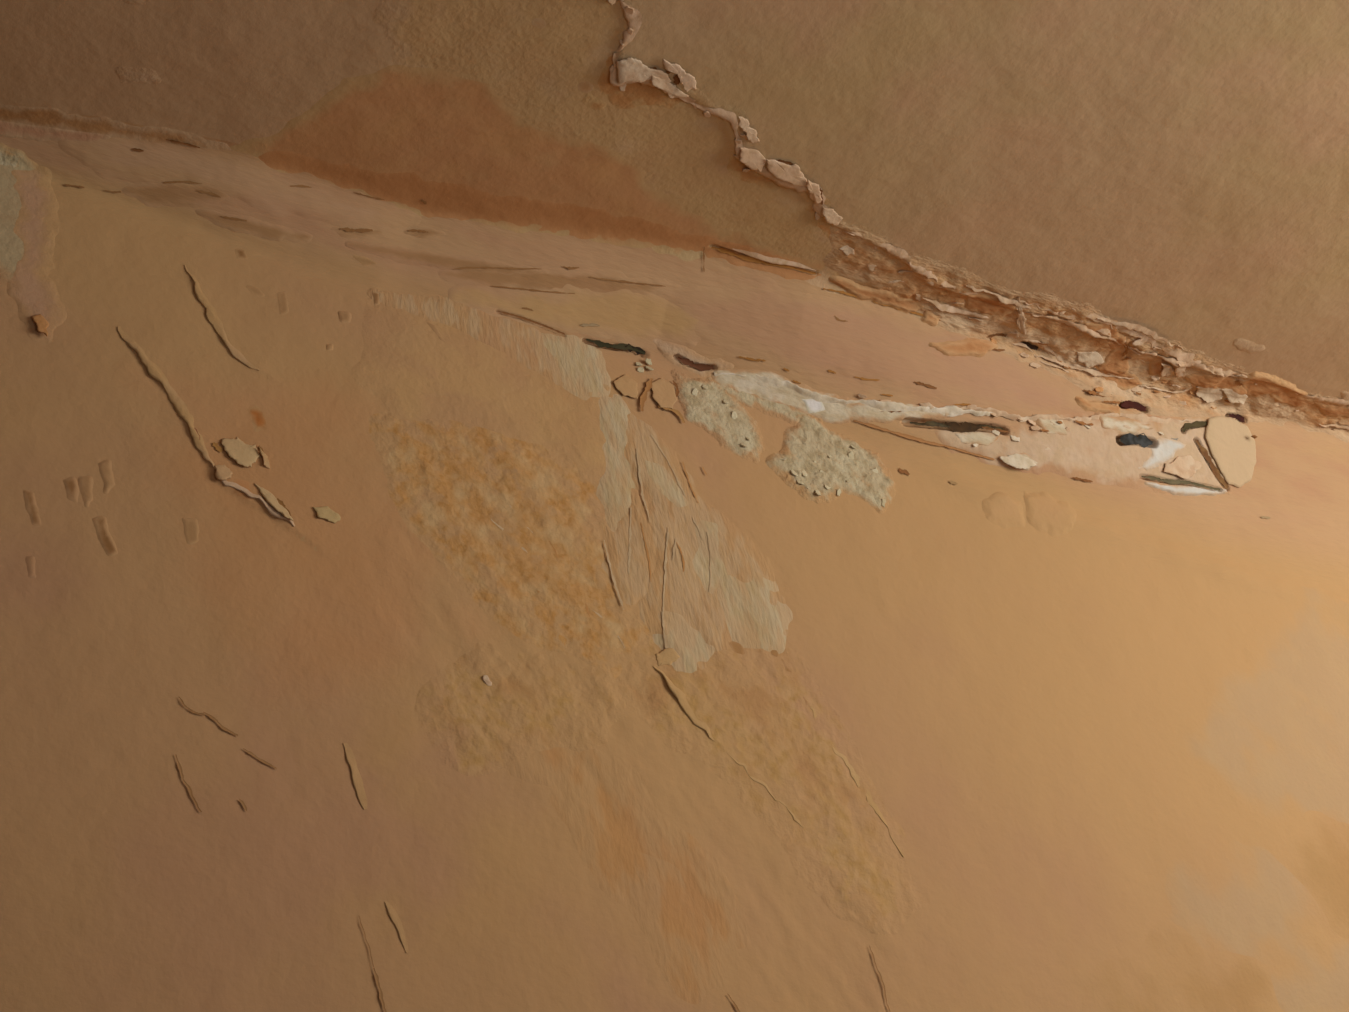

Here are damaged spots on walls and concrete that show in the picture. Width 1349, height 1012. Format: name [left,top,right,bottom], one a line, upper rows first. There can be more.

water stain [58,65,1077,715]
spalling [581,0,1349,515]
crack [179,697,277,769]